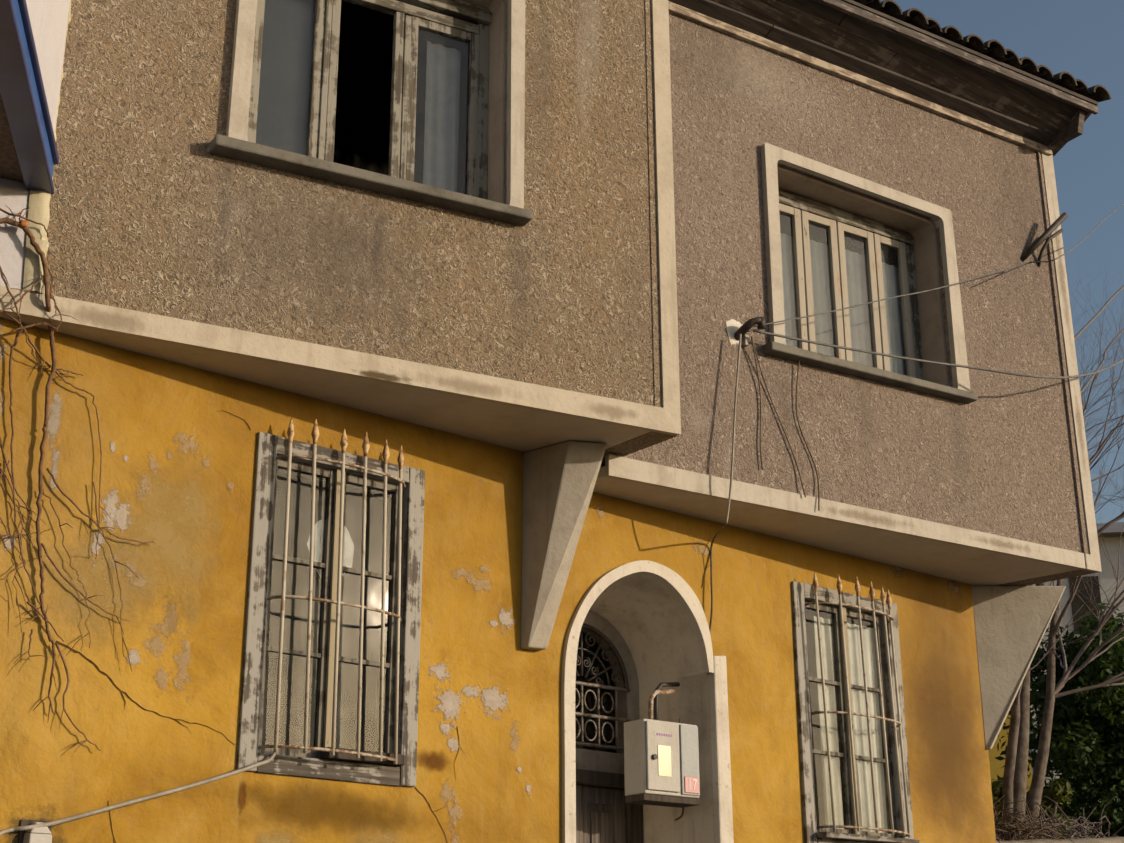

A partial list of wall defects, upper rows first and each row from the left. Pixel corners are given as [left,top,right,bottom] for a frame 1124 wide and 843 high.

peeling [47,394,61,489]
spalling [91,433,210,567]
peeling [127,605,190,690]
peeling [454,566,490,591]
peeling [490,608,516,634]
spalling [429,663,508,752]
peeling [441,783,463,843]